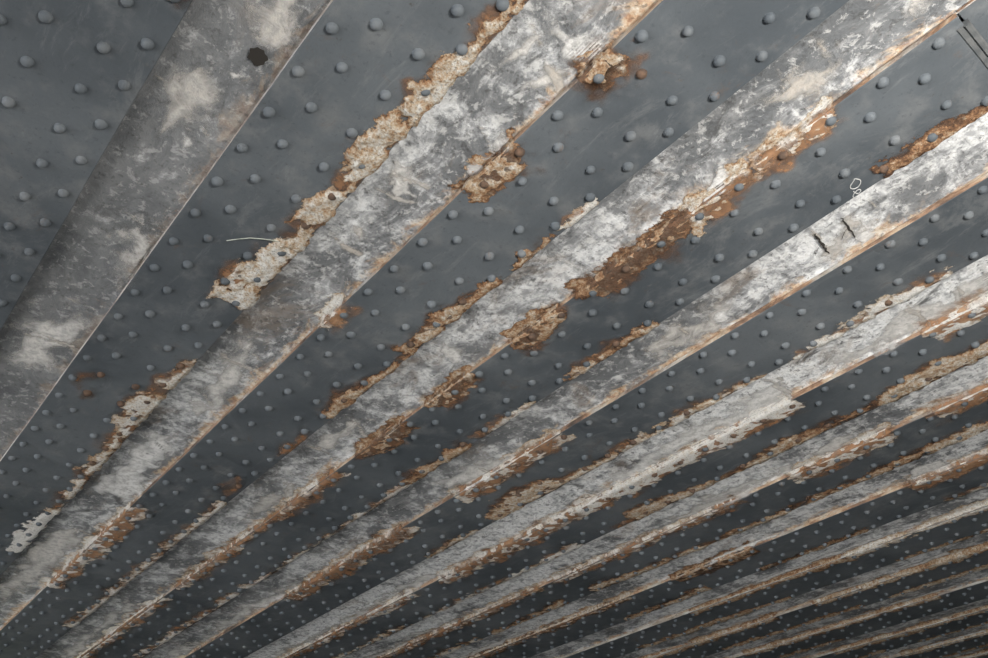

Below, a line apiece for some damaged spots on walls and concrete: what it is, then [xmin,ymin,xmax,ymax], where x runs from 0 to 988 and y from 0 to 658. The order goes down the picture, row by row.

corrosion [207,0,529,311]
corrosion [569,39,647,100]
corrosion [564,92,839,300]
corrosion [869,105,988,179]
corrosion [321,277,503,419]
corrosion [499,303,567,355]
corrosion [789,266,954,362]
corrosion [918,288,988,341]
corrosion [62,466,351,658]
corrosion [132,401,536,658]
corrosion [332,495,746,658]
corrosion [424,339,988,658]